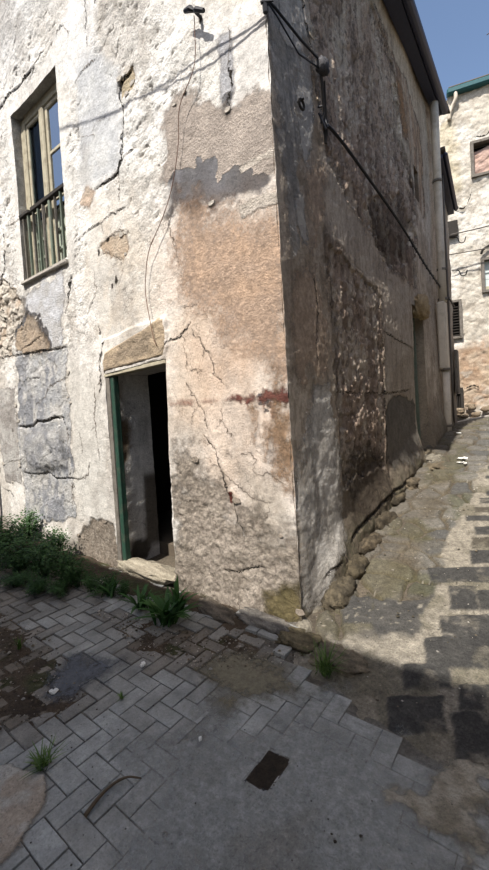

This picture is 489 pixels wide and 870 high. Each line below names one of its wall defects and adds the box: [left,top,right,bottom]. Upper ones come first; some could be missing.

crack [0,51,44,110]
crack [57,0,96,81]
peeling [160,88,276,183]
crack [78,66,137,305]
peeling [0,278,77,524]
crack [164,305,288,532]
corrosion [227,387,289,416]